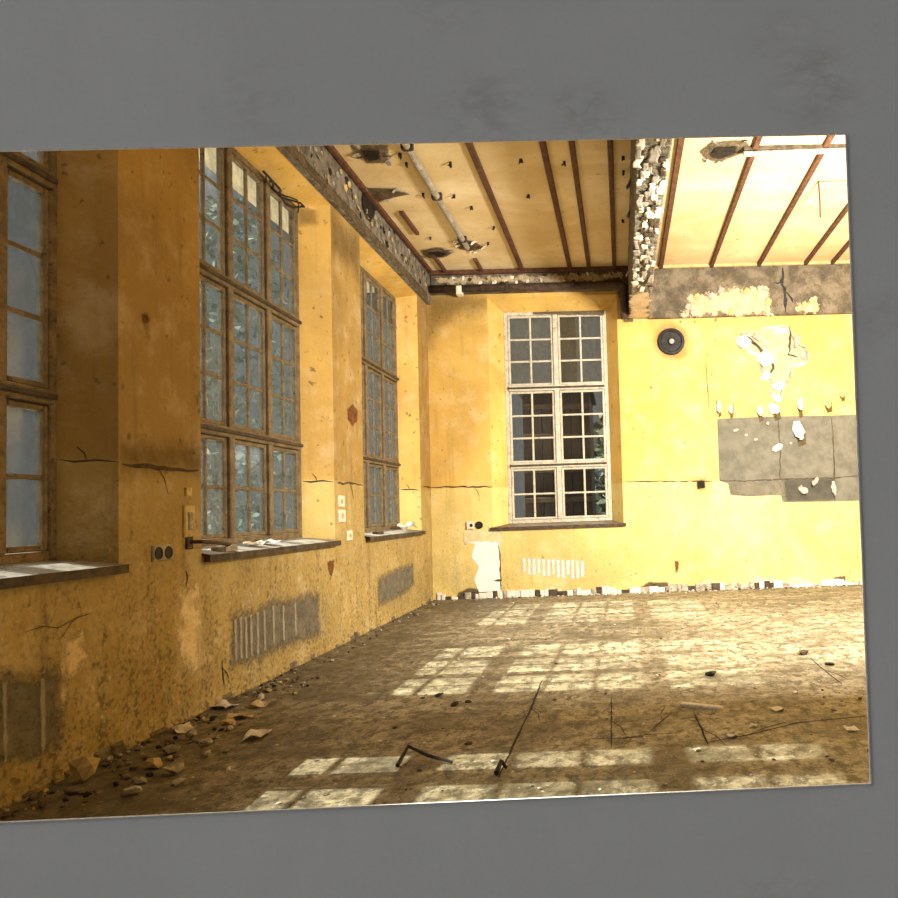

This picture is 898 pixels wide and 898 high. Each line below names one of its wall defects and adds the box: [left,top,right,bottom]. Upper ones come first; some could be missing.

peeling [325,139,670,319]
peeling [680,285,859,502]
crack [60,447,199,492]
flaking render [458,531,502,595]
flaking render [745,575,812,584]